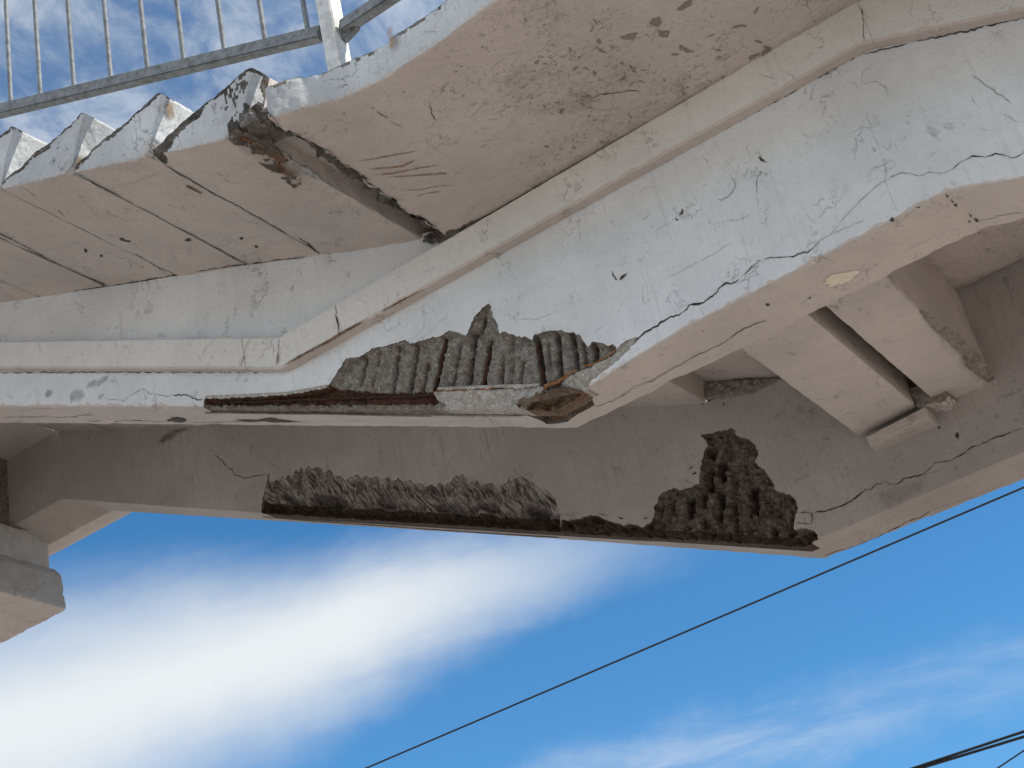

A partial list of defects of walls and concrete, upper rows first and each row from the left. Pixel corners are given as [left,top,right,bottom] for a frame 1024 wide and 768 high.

spalling [228,104,479,245]
corrosion [367,151,447,196]
crack [634,115,1024,342]
peeling [823,270,860,288]
crack [4,389,243,423]
spalling [204,304,639,423]
spalling [262,429,819,551]
crack [796,429,1019,524]